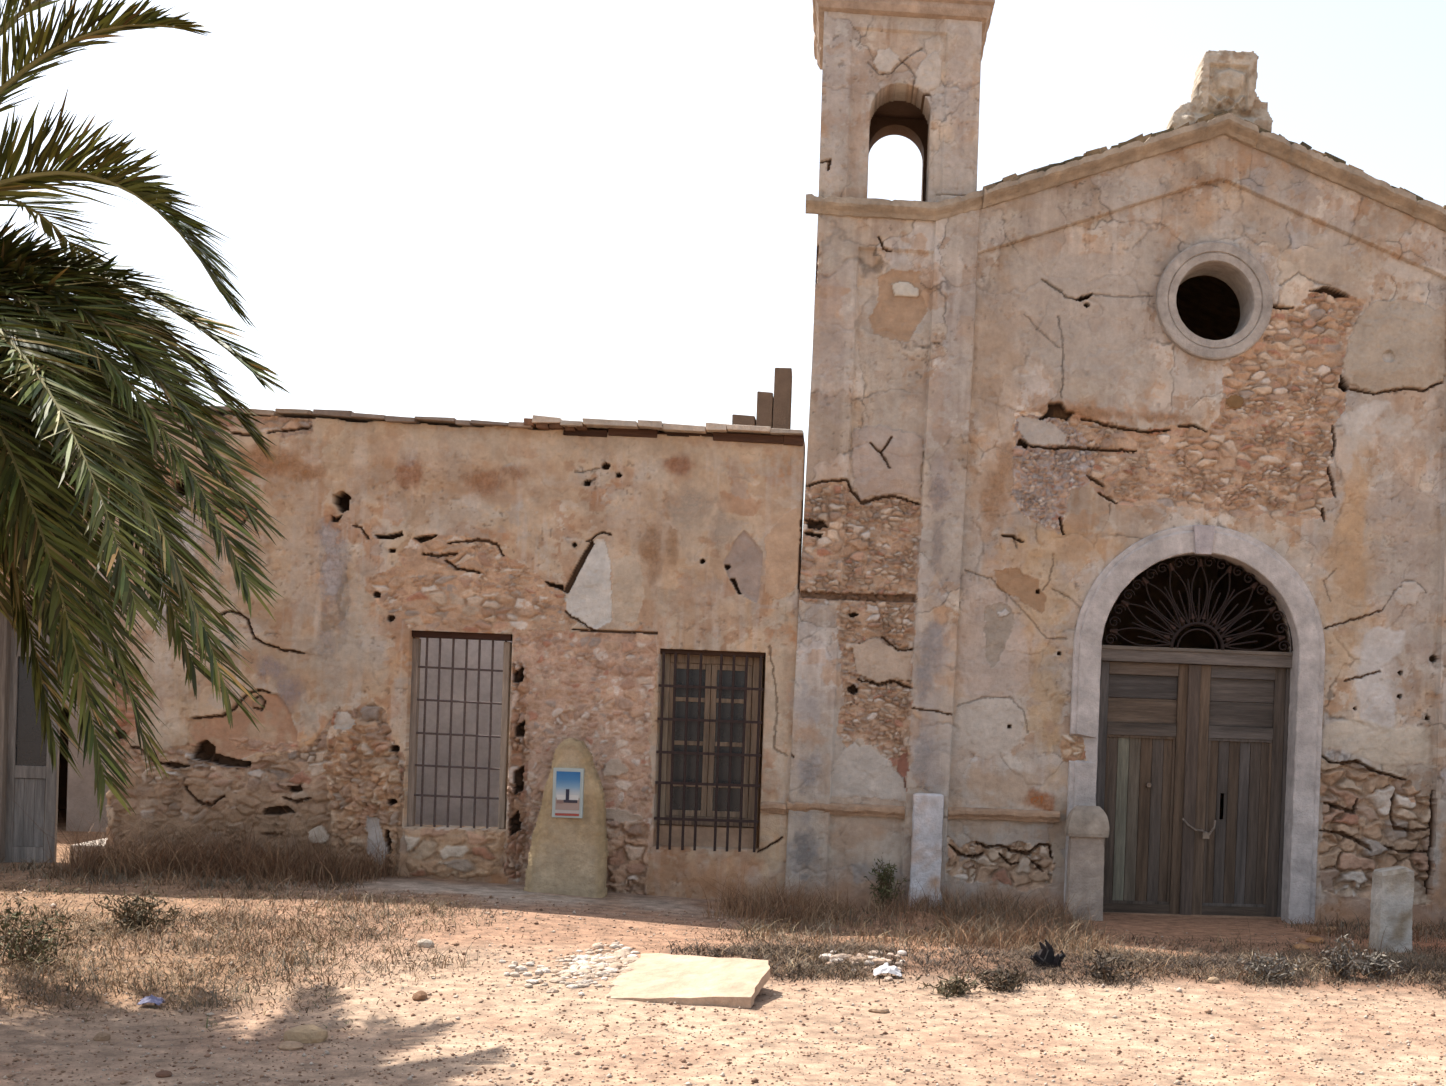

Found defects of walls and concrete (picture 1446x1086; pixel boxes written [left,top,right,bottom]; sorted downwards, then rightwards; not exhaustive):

crack [1024,280,1154,399]
spalling [1011,287,1367,535]
crack [223,611,305,654]
spalling [111,533,658,895]
spalling [724,479,923,793]
crack [1344,671,1381,682]
crack [1323,569,1403,630]
spalling [946,836,1056,892]
spalling [1317,755,1437,907]